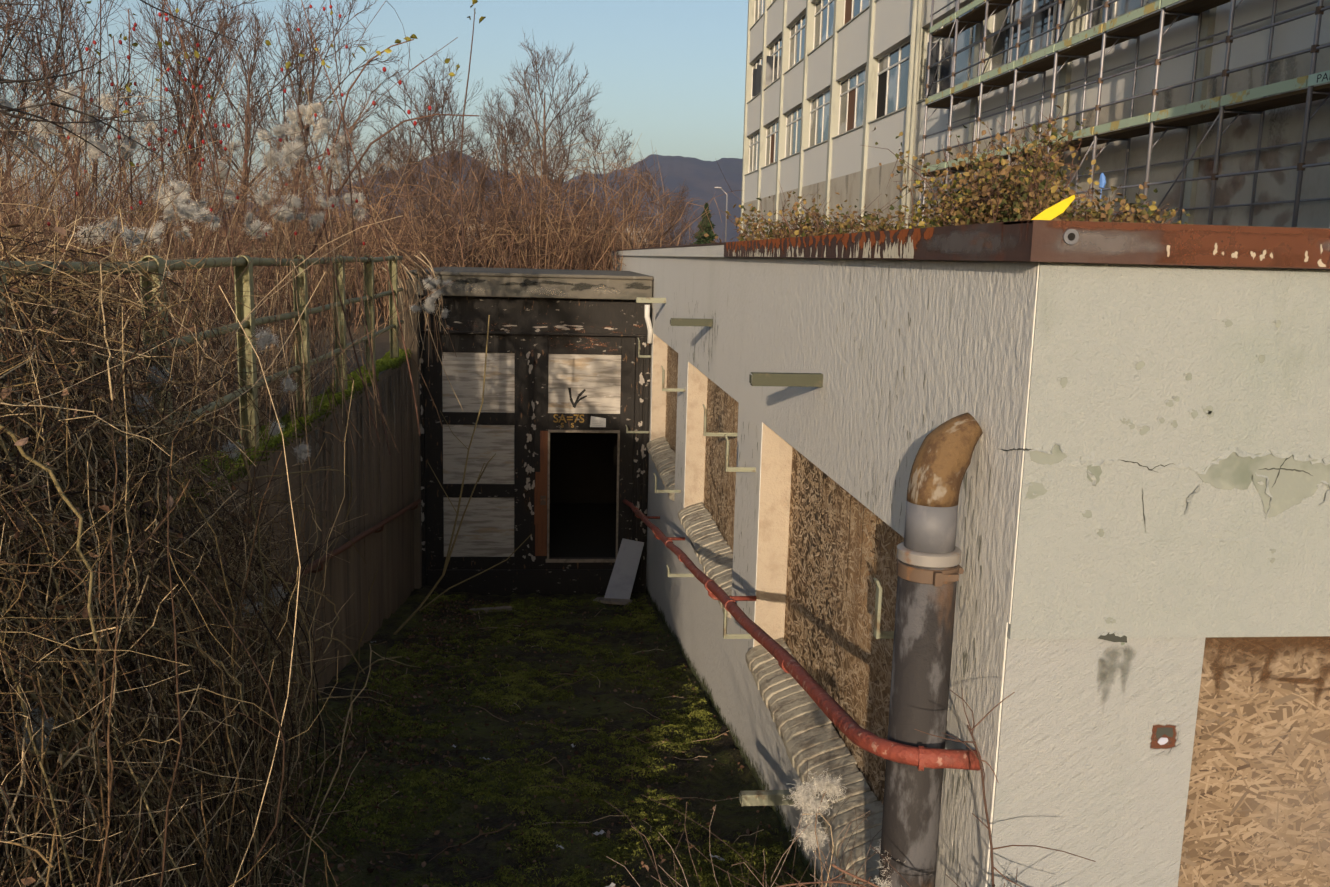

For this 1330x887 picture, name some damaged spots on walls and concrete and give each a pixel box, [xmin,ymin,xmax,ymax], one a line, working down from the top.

rust [726,227,934,253]
rust [1049,221,1330,268]
peeling [1025,442,1119,500]
peeling [1155,446,1330,519]
rust [1143,715,1182,756]